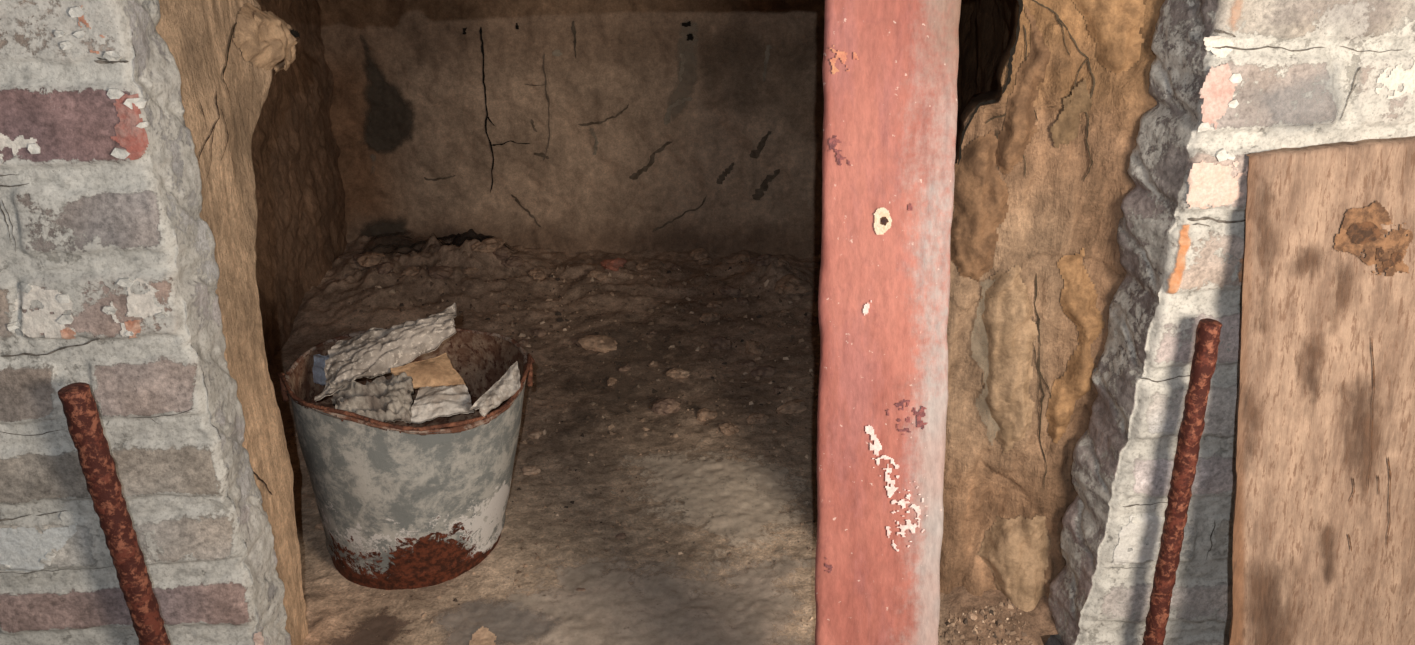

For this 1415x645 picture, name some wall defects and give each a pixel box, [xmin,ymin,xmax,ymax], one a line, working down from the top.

damp [362,39,413,160]
crack [479,21,576,192]